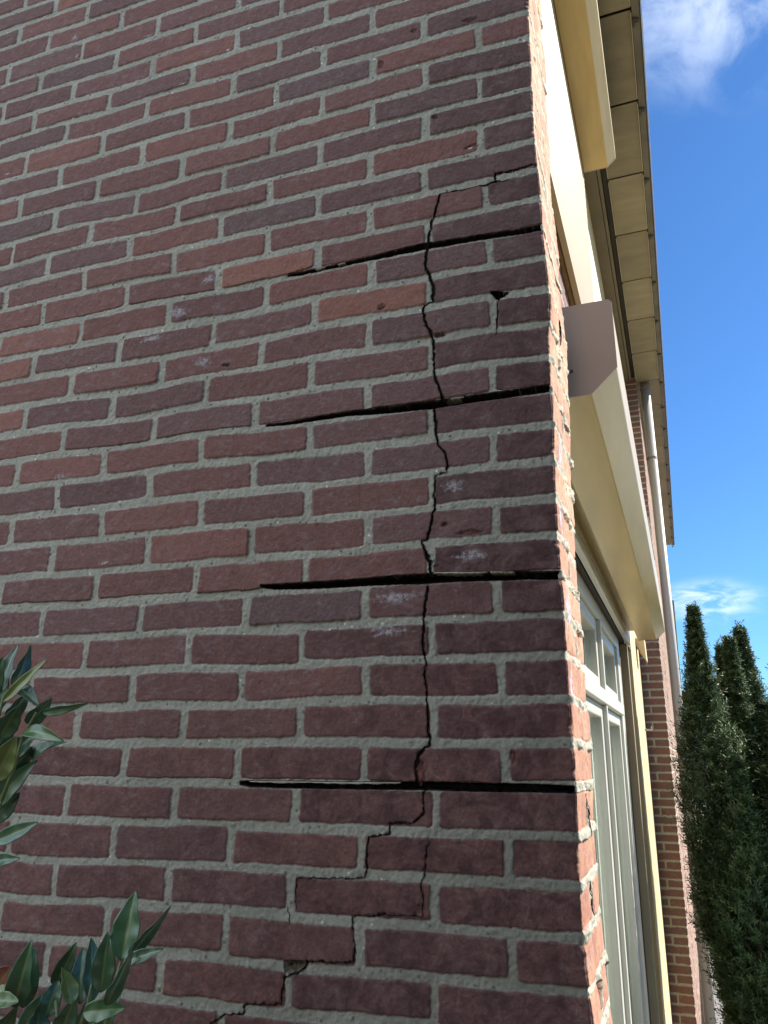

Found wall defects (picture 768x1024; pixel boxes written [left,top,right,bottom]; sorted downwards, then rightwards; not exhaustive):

crack [210,164,592,1024]